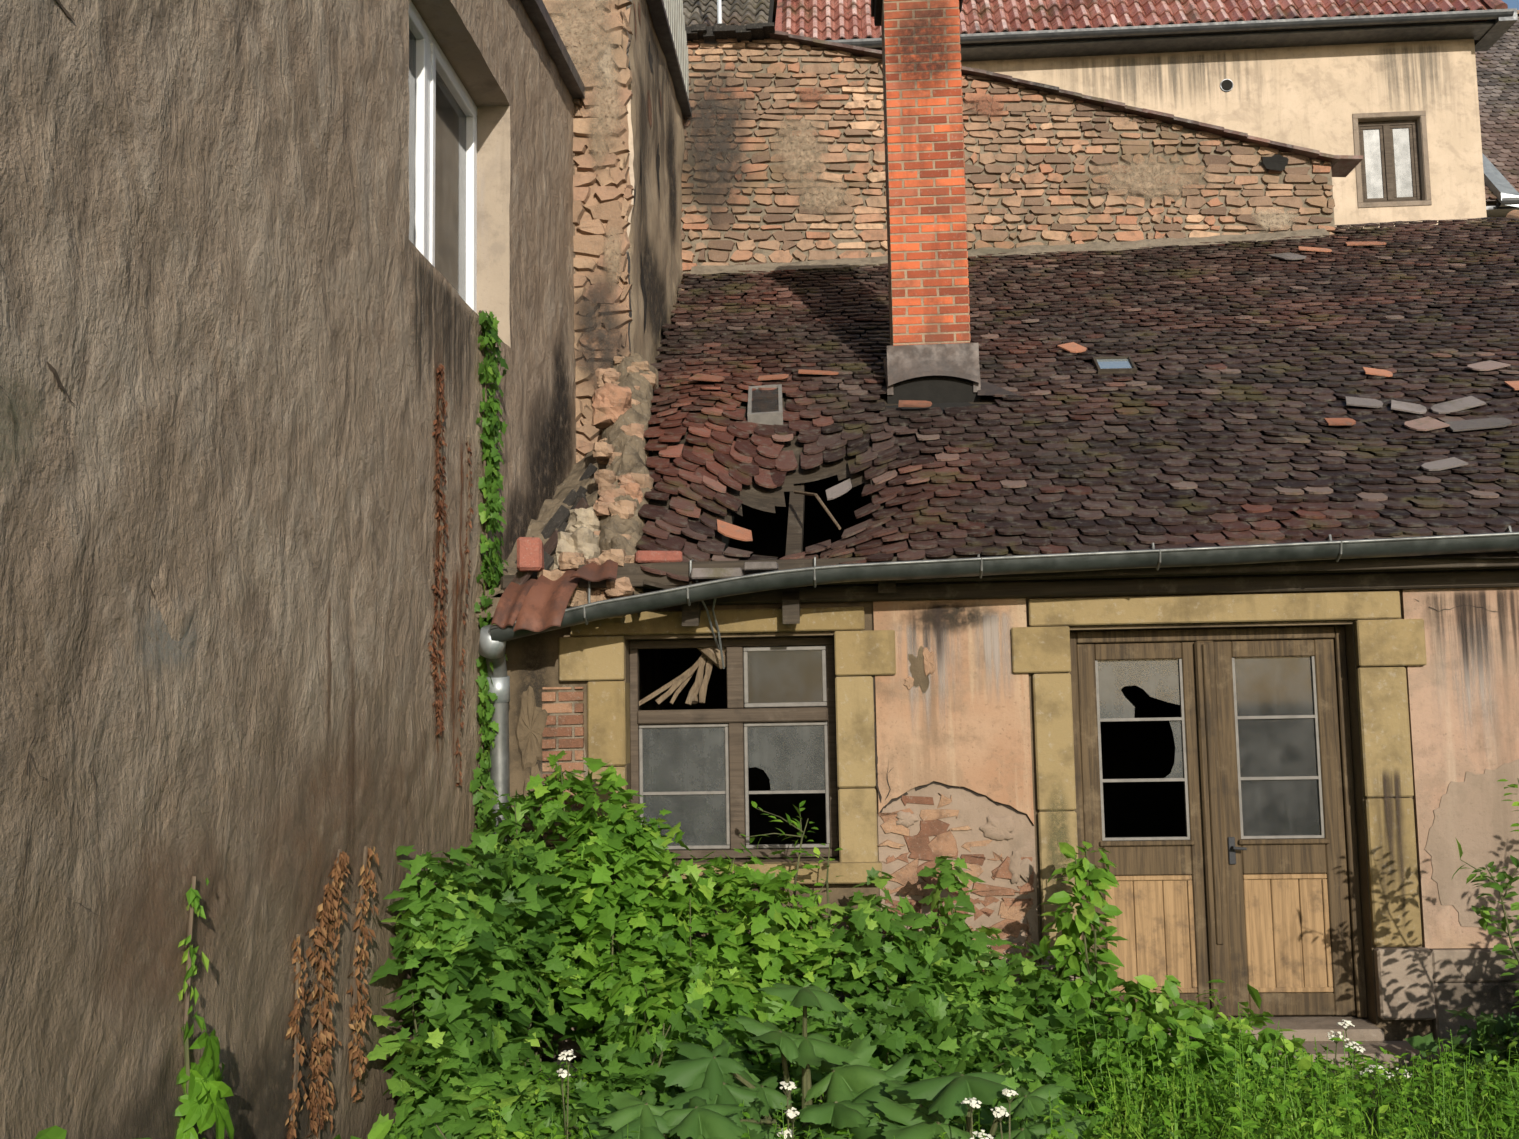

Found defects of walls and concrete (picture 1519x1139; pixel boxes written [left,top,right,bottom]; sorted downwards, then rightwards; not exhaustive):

water stain [908,605,1008,708]
water stain [1457,592,1516,707]
spalling [877,781,1040,984]
water stain [1383,774,1404,892]